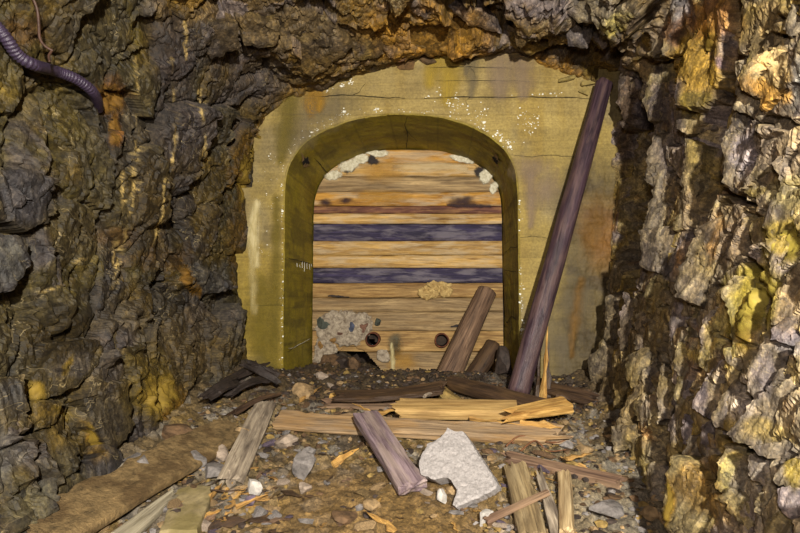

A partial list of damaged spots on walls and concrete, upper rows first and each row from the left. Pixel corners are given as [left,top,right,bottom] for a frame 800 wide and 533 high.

crack [302,84,400,98]
water stain [421,56,512,150]
crack [424,66,589,106]